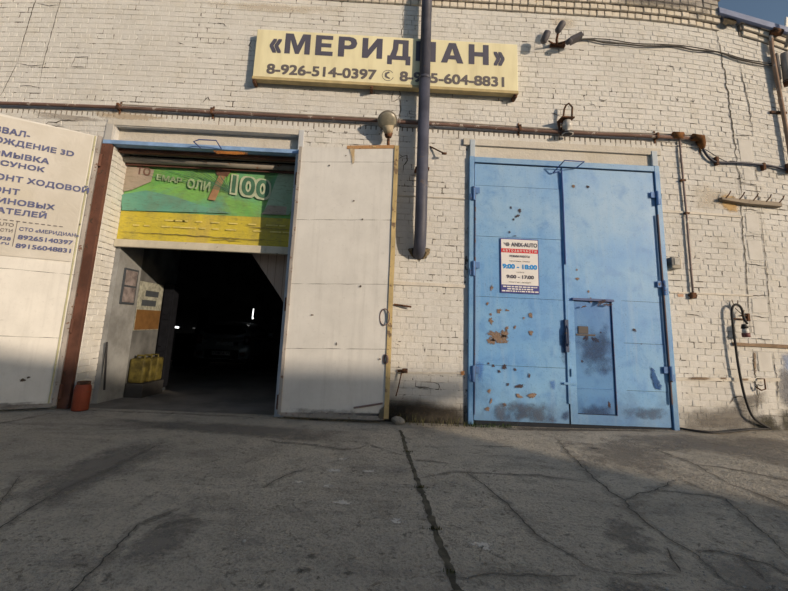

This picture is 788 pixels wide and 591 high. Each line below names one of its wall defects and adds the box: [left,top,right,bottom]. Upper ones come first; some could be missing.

crack [716,32,779,413]
leakage [382,407,461,424]